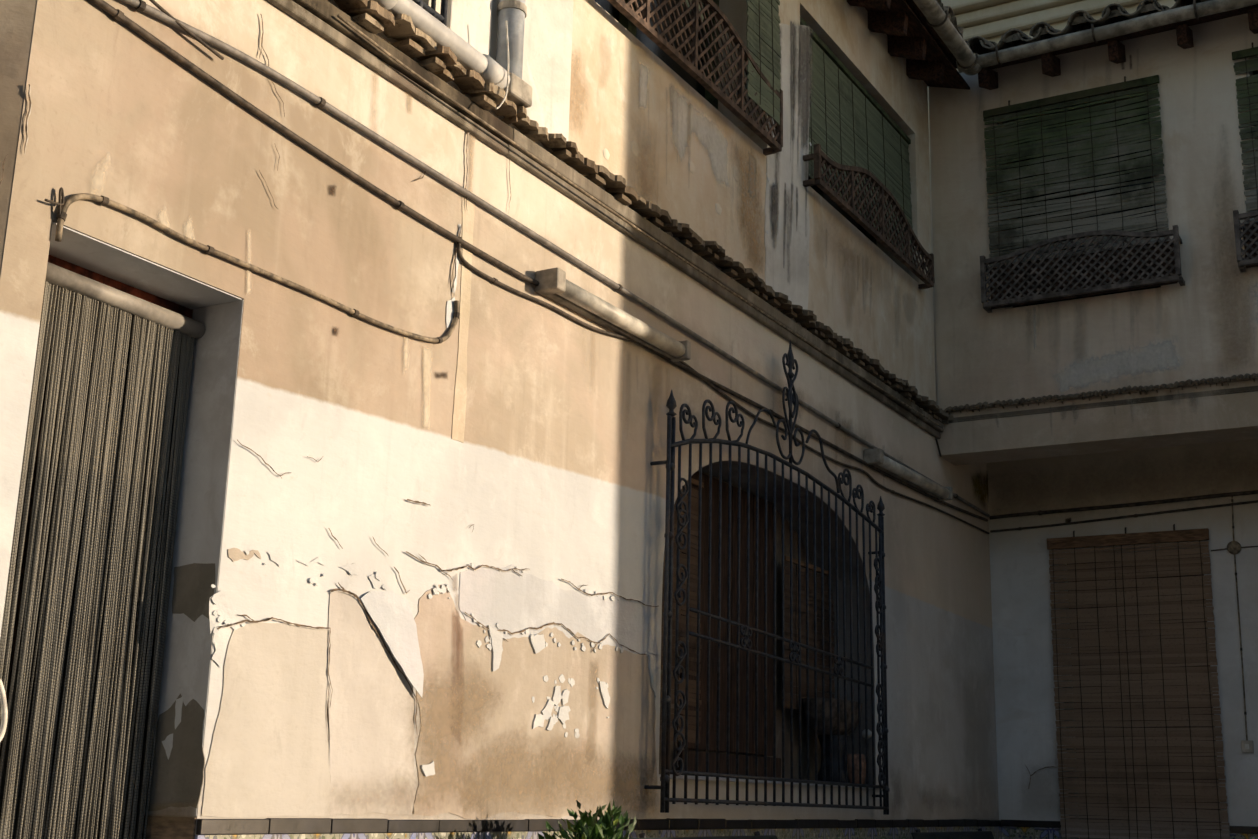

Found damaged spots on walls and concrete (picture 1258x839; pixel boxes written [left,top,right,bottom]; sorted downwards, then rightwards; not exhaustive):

crack [0,84,31,184]
leakage [771,22,812,146]
peeling [145,548,660,819]